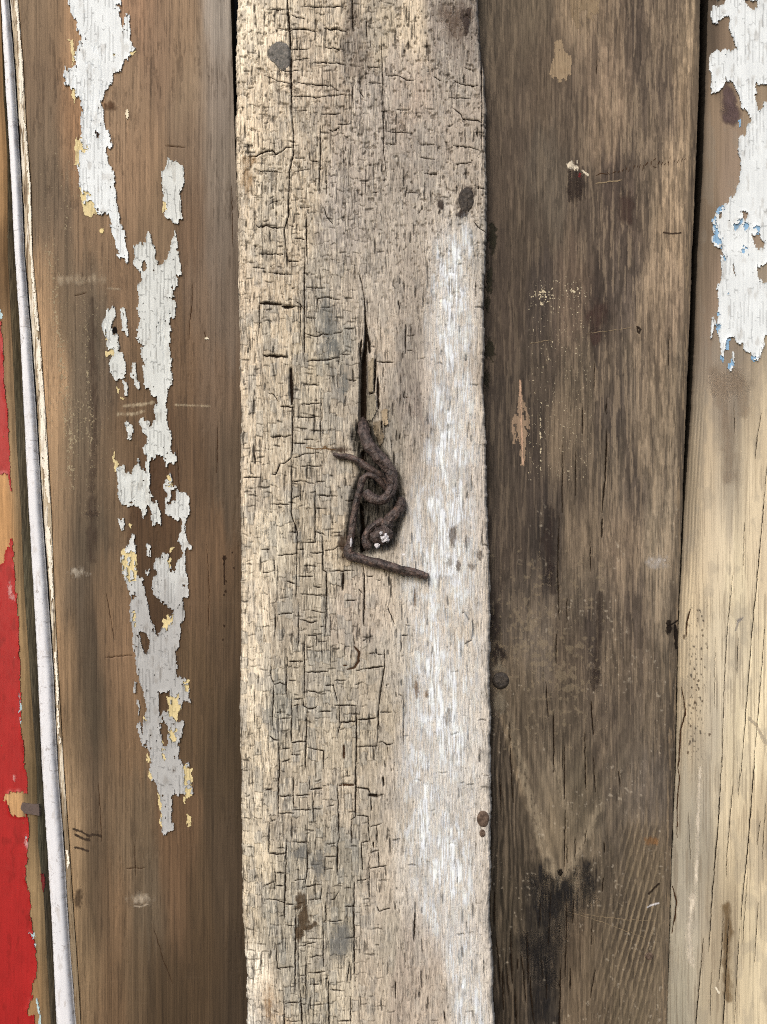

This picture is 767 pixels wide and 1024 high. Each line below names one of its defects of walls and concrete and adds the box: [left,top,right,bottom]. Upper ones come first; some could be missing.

peeling [63,0,194,835]
crack [231,0,482,1024]
peeling [709,0,767,371]